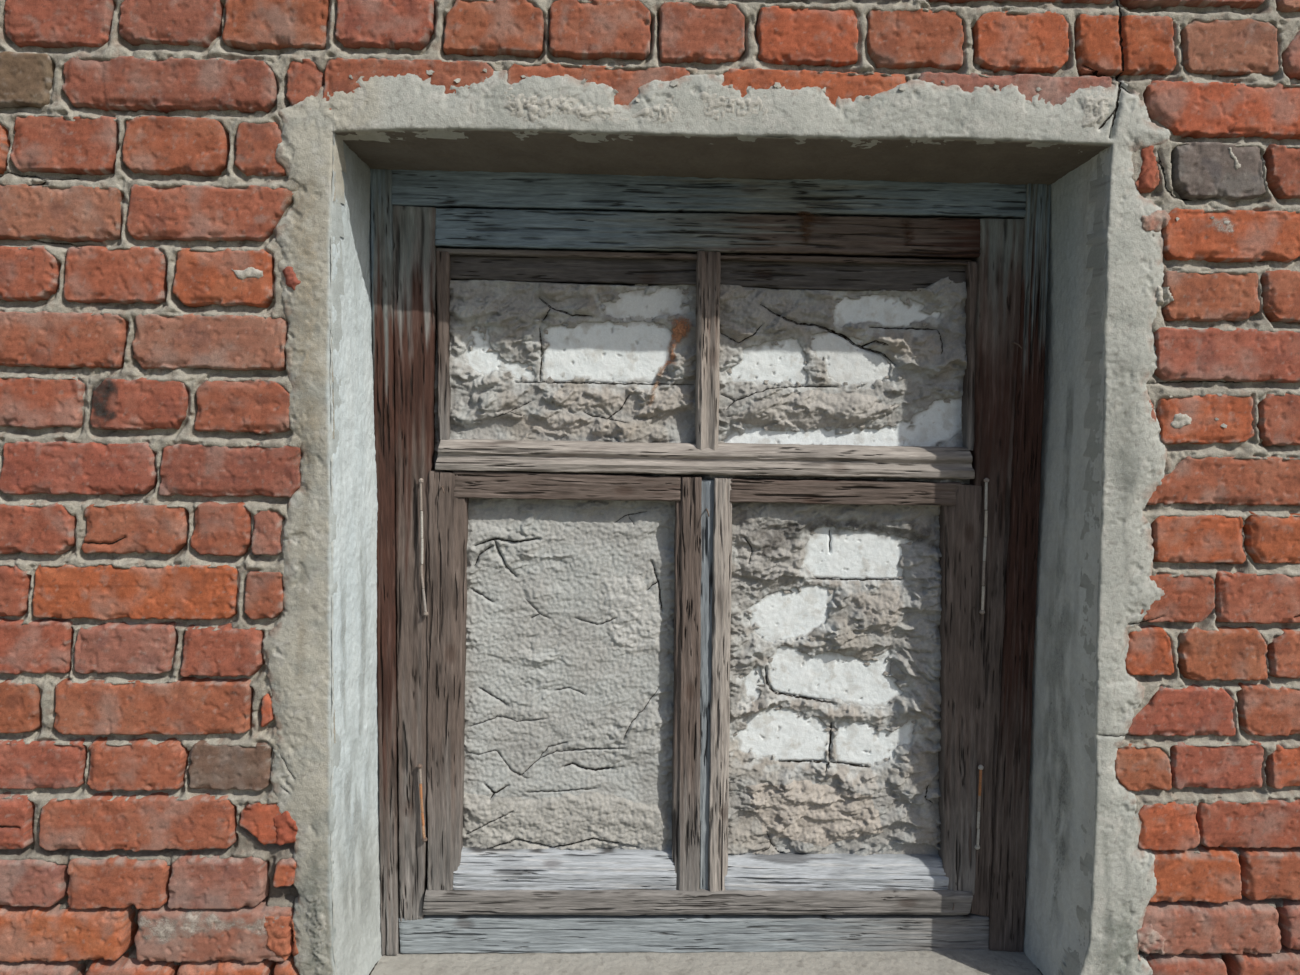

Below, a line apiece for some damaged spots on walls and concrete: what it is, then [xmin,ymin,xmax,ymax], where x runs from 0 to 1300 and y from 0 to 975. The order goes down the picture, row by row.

peeling [322,58,690,110]
peeling [721,68,1112,106]
crack [1084,0,1130,138]
spalling [464,284,691,384]
crack [494,299,689,423]
corrosion [650,319,690,404]
crack [721,304,943,365]
spalling [727,294,941,389]
spalling [718,396,962,447]
crack [472,538,540,602]
spalling [733,526,916,769]
crack [467,688,657,848]